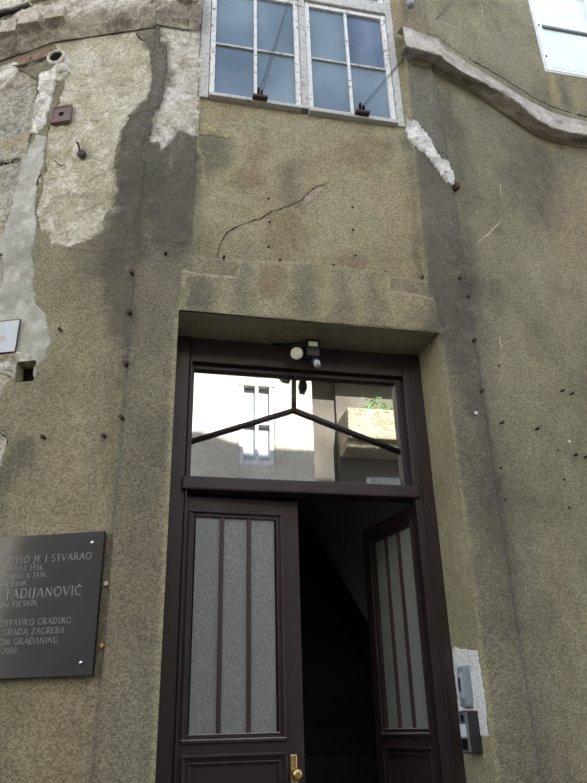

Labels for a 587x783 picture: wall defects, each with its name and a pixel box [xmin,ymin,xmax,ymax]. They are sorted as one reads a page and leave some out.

flaking render [0,0,67,39]
flaking render [149,18,233,150]
flaking render [0,33,152,247]
damp [106,29,198,334]
crack [217,180,329,256]
spalling [23,368,34,382]
flaking render [0,431,9,466]